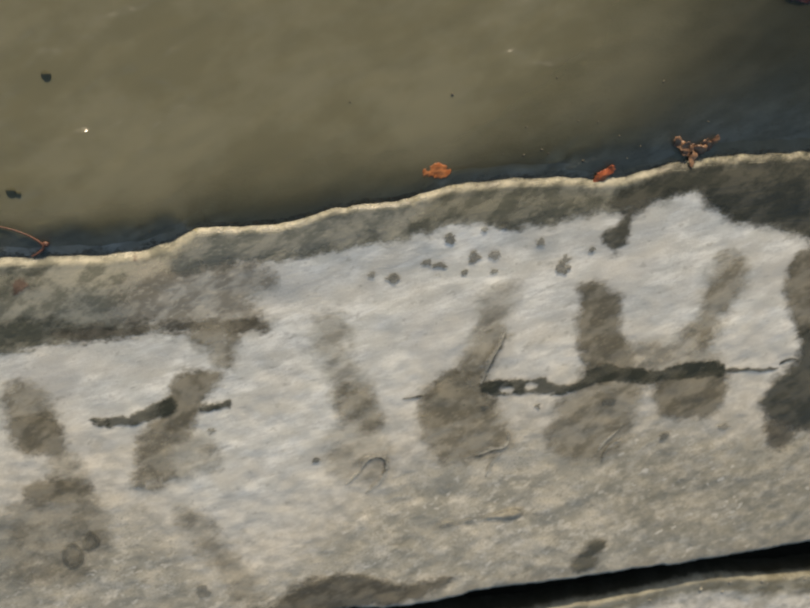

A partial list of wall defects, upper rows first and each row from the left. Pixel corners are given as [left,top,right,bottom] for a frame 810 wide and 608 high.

damp [0,152,810,482]
crack [480,358,798,396]
crack [90,397,178,428]
crack [200,399,231,412]
damp [13,463,108,582]